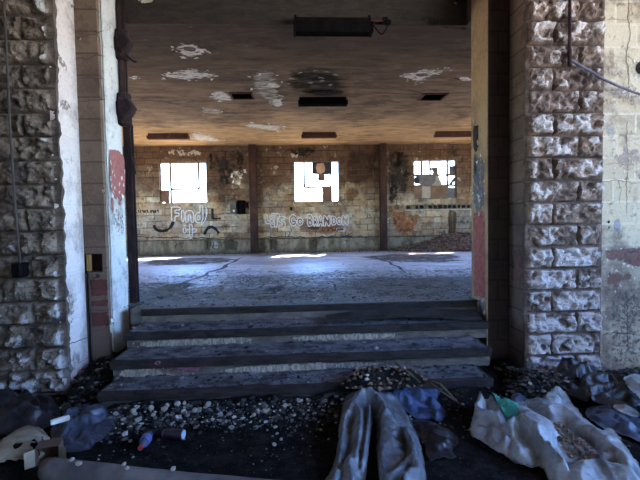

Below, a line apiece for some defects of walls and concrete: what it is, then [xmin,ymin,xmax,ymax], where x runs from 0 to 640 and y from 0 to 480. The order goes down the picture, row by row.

peeling [171,43,210,59]
crack [607,0,638,103]
peeling [161,68,218,81]
peeling [210,91,231,102]
peeling [247,70,302,107]
peeling [399,67,452,85]
peeling [246,122,285,132]
leakage [389,152,410,202]
crack [182,257,242,283]
peeling [605,248,640,363]